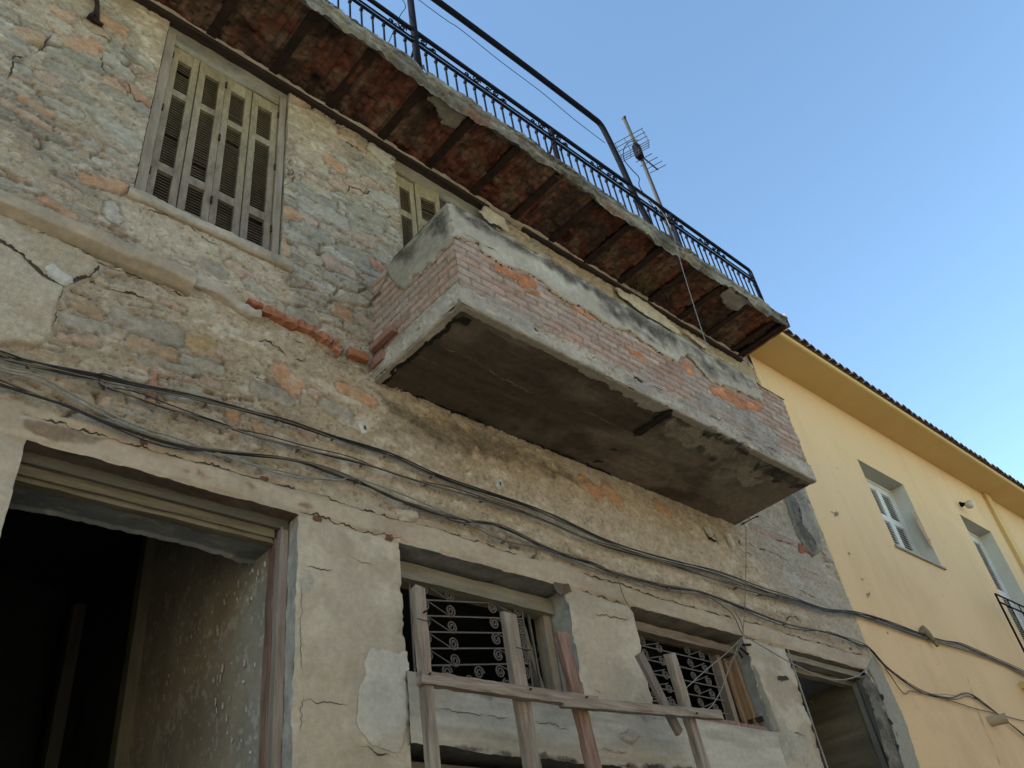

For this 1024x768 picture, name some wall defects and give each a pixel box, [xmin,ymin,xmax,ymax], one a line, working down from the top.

crack [8,35,51,77]
peeling [427,86,468,129]
peeling [479,206,509,232]
crack [0,229,182,326]
spalling [381,317,472,385]
water stain [545,260,675,342]
peeling [616,287,707,348]
crack [23,413,535,559]
water stain [698,432,748,459]
water stain [754,464,817,549]
crack [584,573,861,655]
peeling [357,648,409,753]